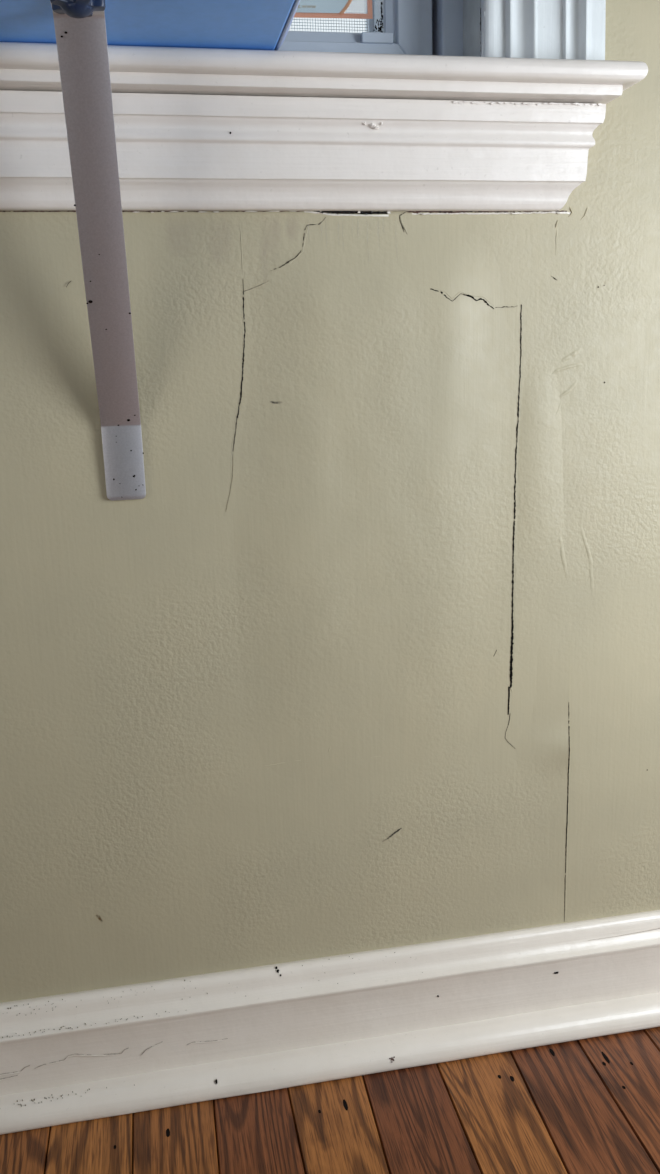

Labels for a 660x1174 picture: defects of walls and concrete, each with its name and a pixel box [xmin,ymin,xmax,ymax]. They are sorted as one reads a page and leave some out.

crack [224,217,326,512]
crack [430,288,522,746]
crack [563,705,571,922]